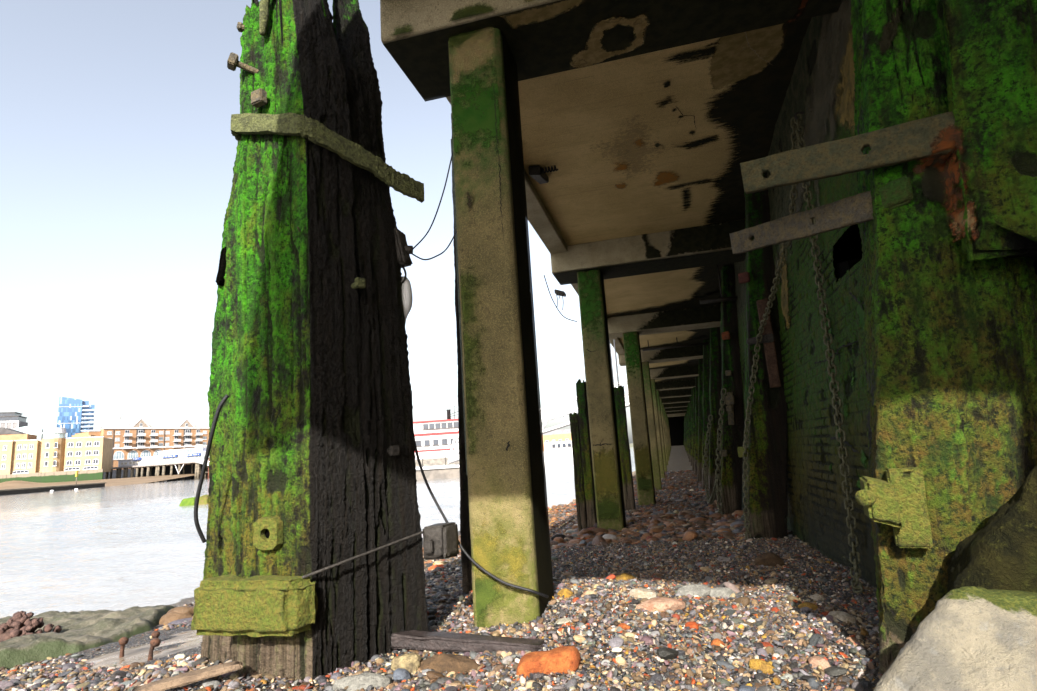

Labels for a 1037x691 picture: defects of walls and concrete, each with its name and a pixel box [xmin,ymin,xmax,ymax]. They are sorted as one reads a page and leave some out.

peeling [570,14,649,68]
rust [912,124,982,244]
damp [383,0,852,617]
damp [800,485,877,590]